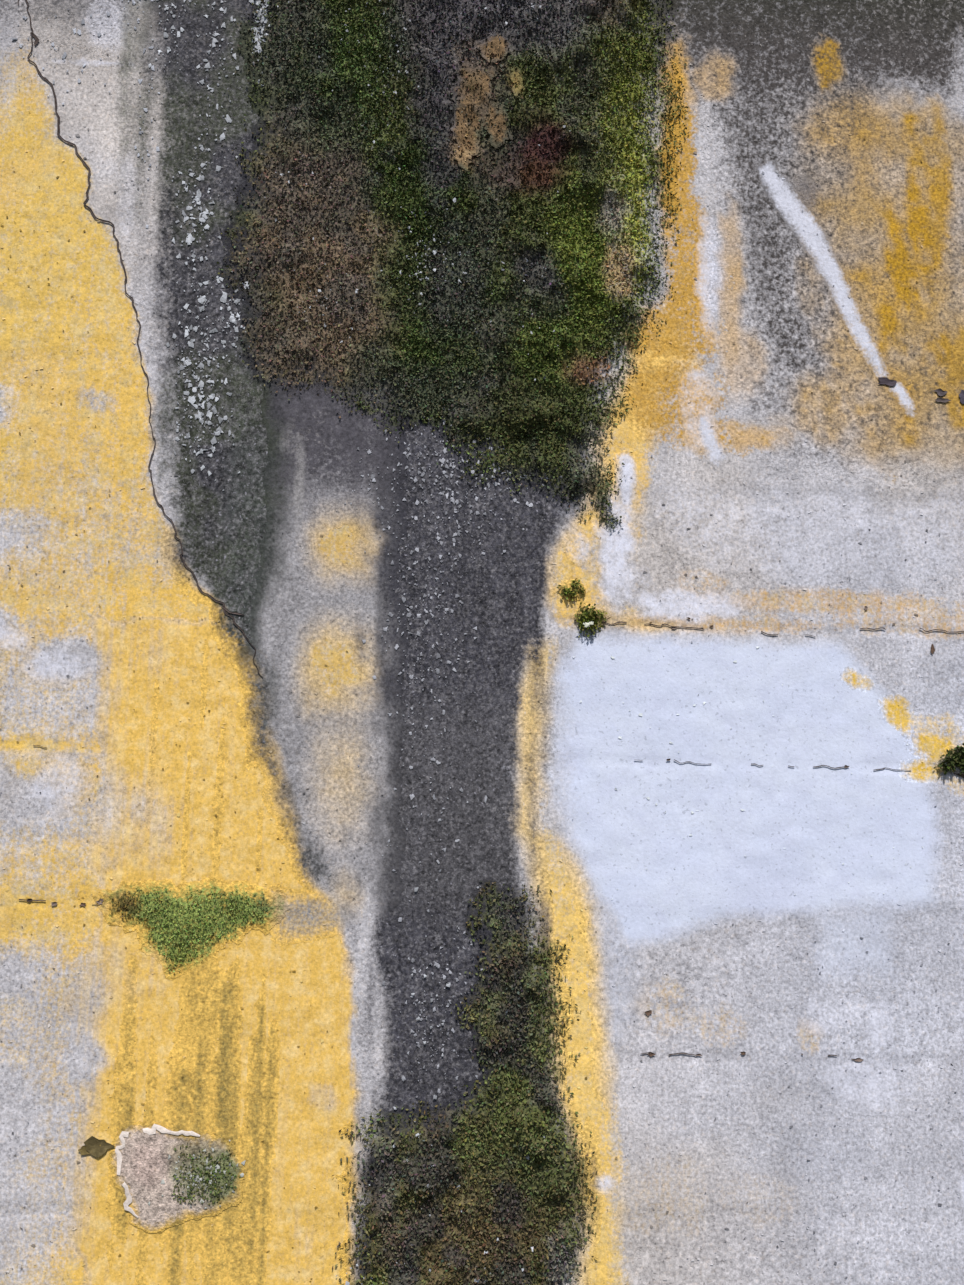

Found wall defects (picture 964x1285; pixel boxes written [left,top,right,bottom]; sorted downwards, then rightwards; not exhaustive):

crack [18,0,261,676]
peeling [0,37,365,1285]
water stain [211,645,362,946]
water stain [292,431,307,556]
water stain [105,945,280,1285]